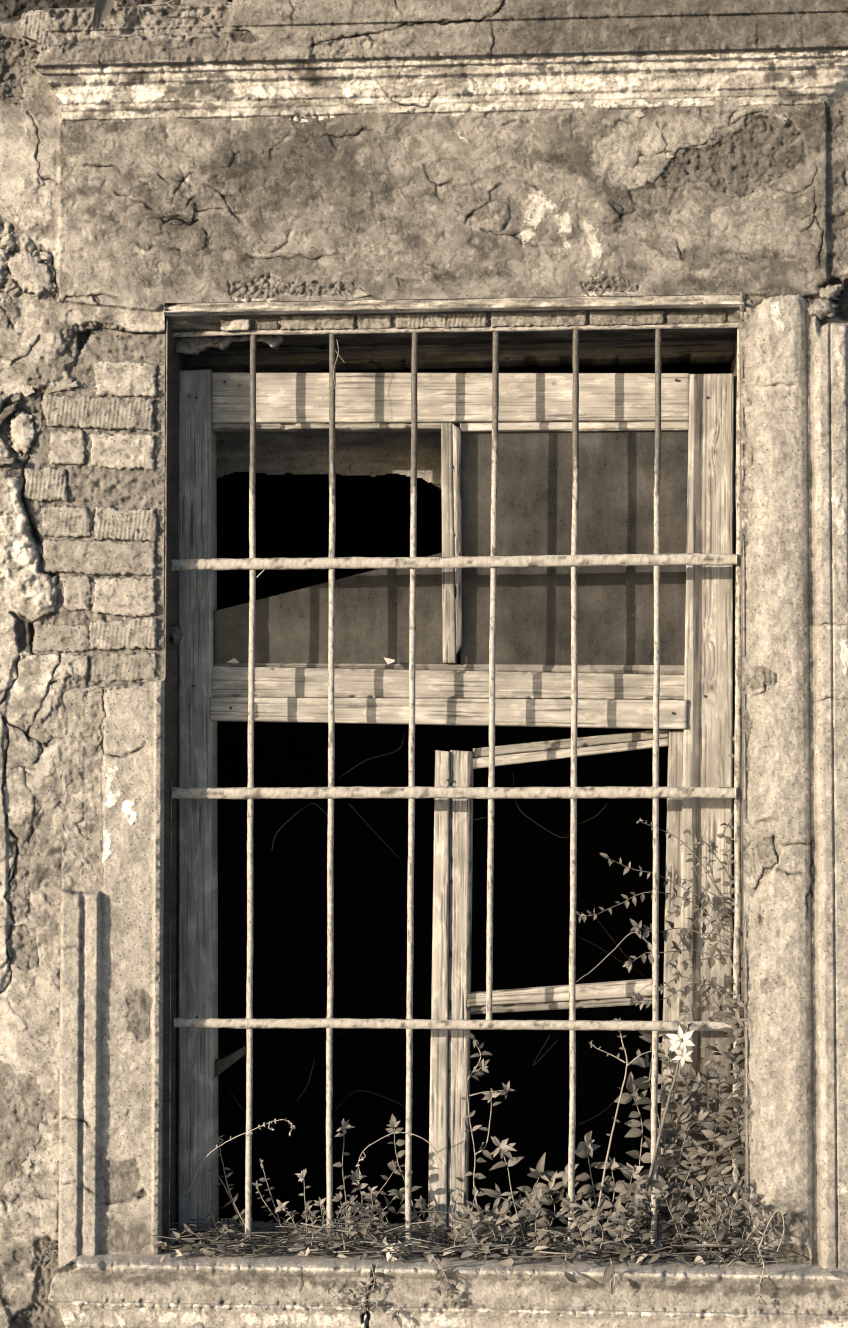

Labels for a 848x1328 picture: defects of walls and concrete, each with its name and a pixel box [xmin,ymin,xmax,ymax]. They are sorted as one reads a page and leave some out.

spalling [467,50,848,198]
crack [110,157,236,250]
flaking render [0,322,165,892]
crack [0,657,60,993]
spalling [11,1232,77,1328]
peeling [62,1300,493,1328]
peeling [569,1310,679,1318]